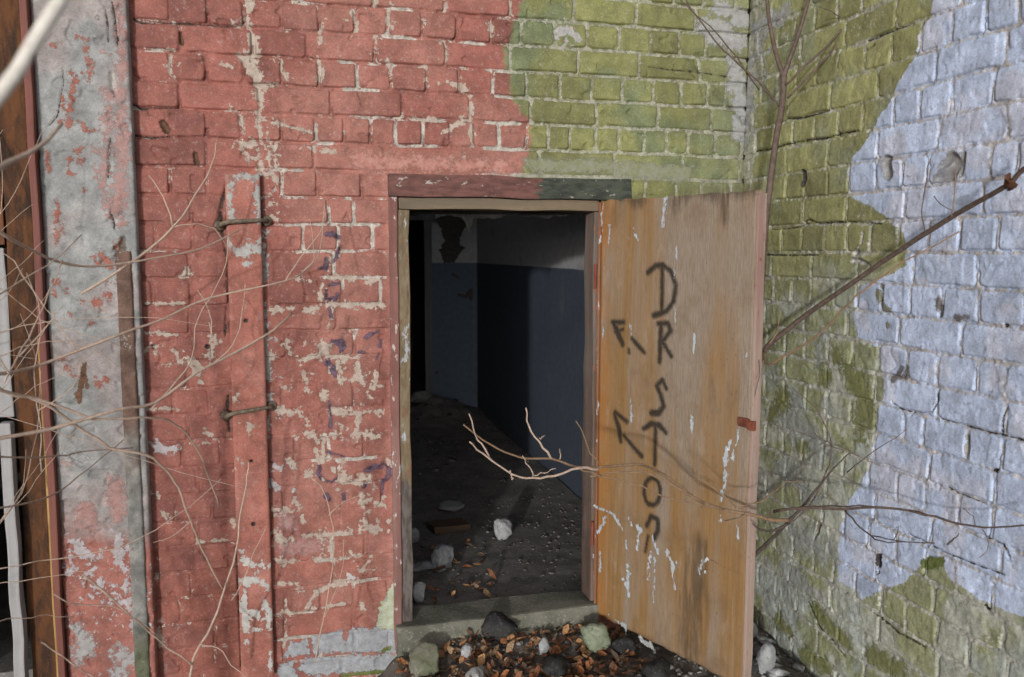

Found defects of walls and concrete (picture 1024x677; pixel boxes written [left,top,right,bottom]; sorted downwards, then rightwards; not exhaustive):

peeling [163,32,184,81]
peeling [343,0,397,81]
peeling [66,145,86,176]
peeling [56,69,99,136]
spalling [159,119,171,134]
peeling [219,0,342,284]
peeling [406,38,476,148]
peeling [51,200,65,245]
spalling [113,236,126,263]
peeling [143,330,223,385]
peeling [148,427,217,456]
peeling [195,253,392,646]